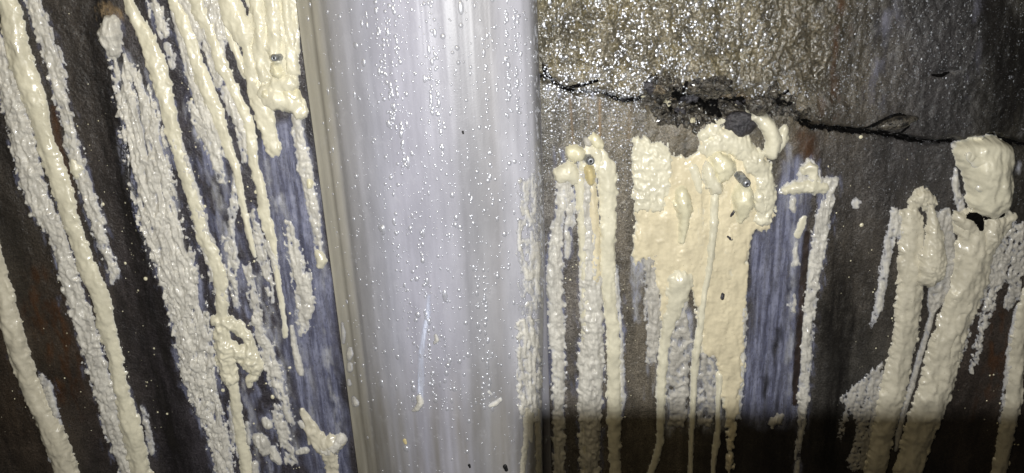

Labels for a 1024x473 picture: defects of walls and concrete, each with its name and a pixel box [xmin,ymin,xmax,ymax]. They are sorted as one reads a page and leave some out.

crack [540,61,688,103]
crack [931,71,950,79]
crack [781,89,957,144]
crack [986,132,1024,146]